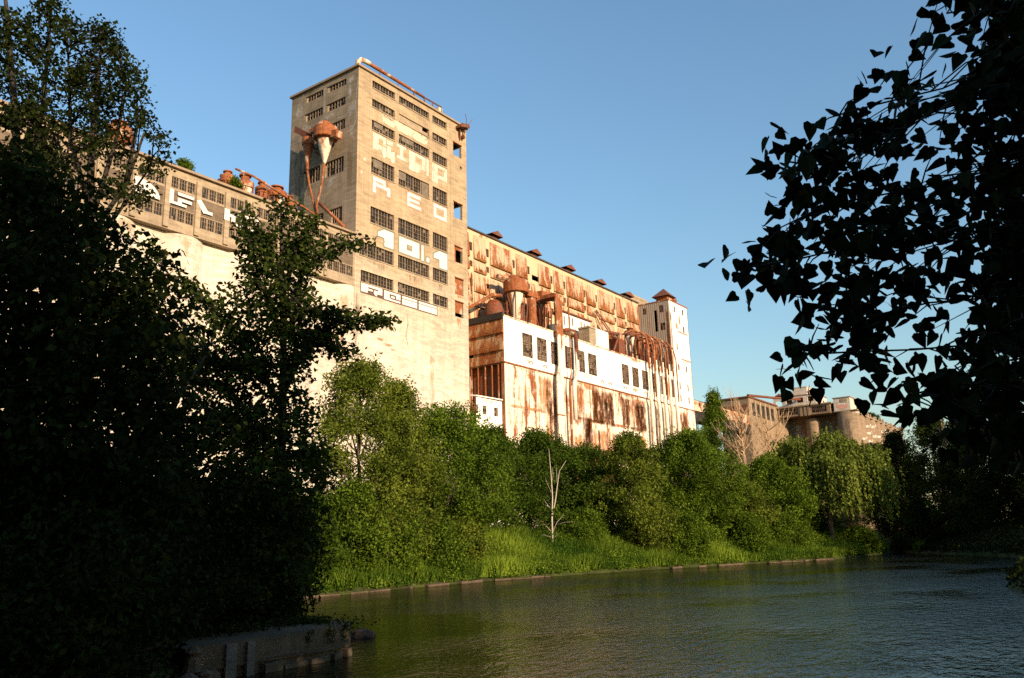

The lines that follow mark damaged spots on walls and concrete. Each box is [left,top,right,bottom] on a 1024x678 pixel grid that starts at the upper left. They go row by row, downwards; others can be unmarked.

rust [458,251,639,339]
rust [652,311,680,396]
rust [512,367,657,468]